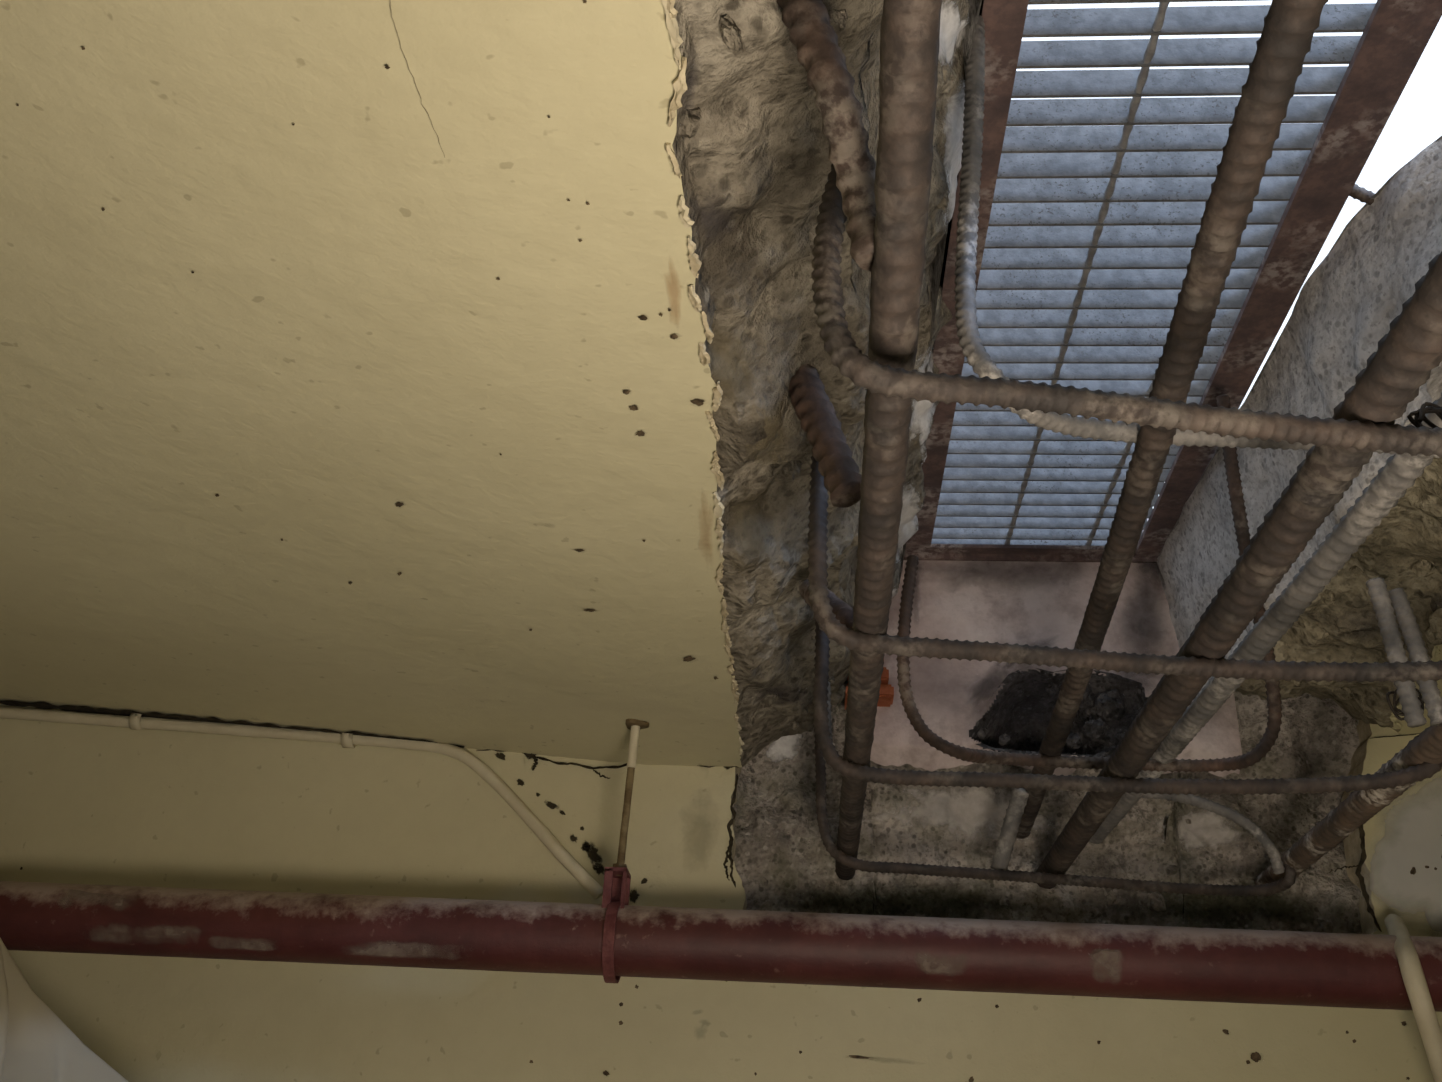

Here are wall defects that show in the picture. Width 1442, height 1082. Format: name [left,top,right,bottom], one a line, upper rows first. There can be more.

crack [0,700,627,779]
spalling [662,0,1442,934]